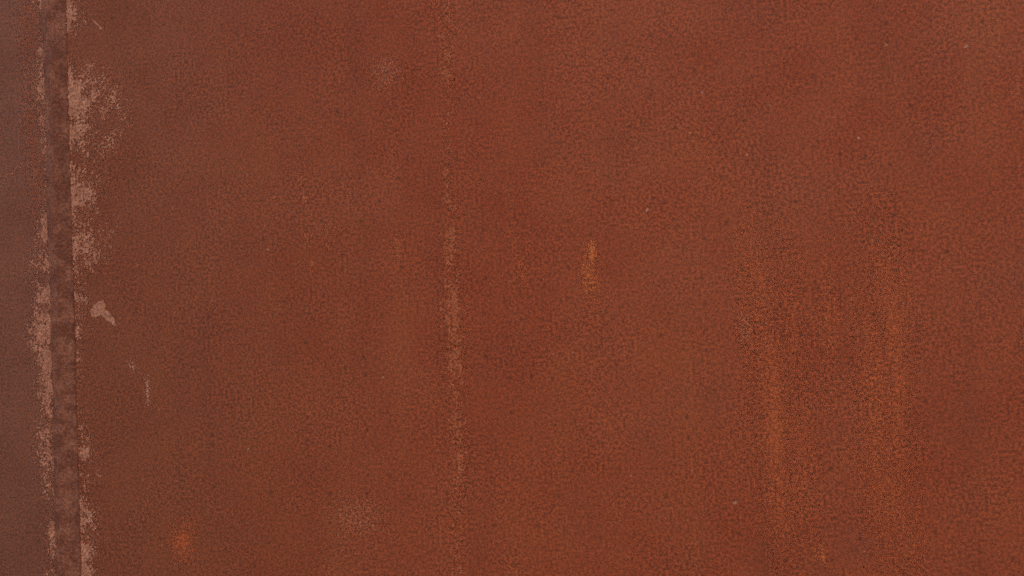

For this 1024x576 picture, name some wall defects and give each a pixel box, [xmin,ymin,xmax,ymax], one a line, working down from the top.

leakage [67,56,133,576]
corrosion [727,199,823,575]